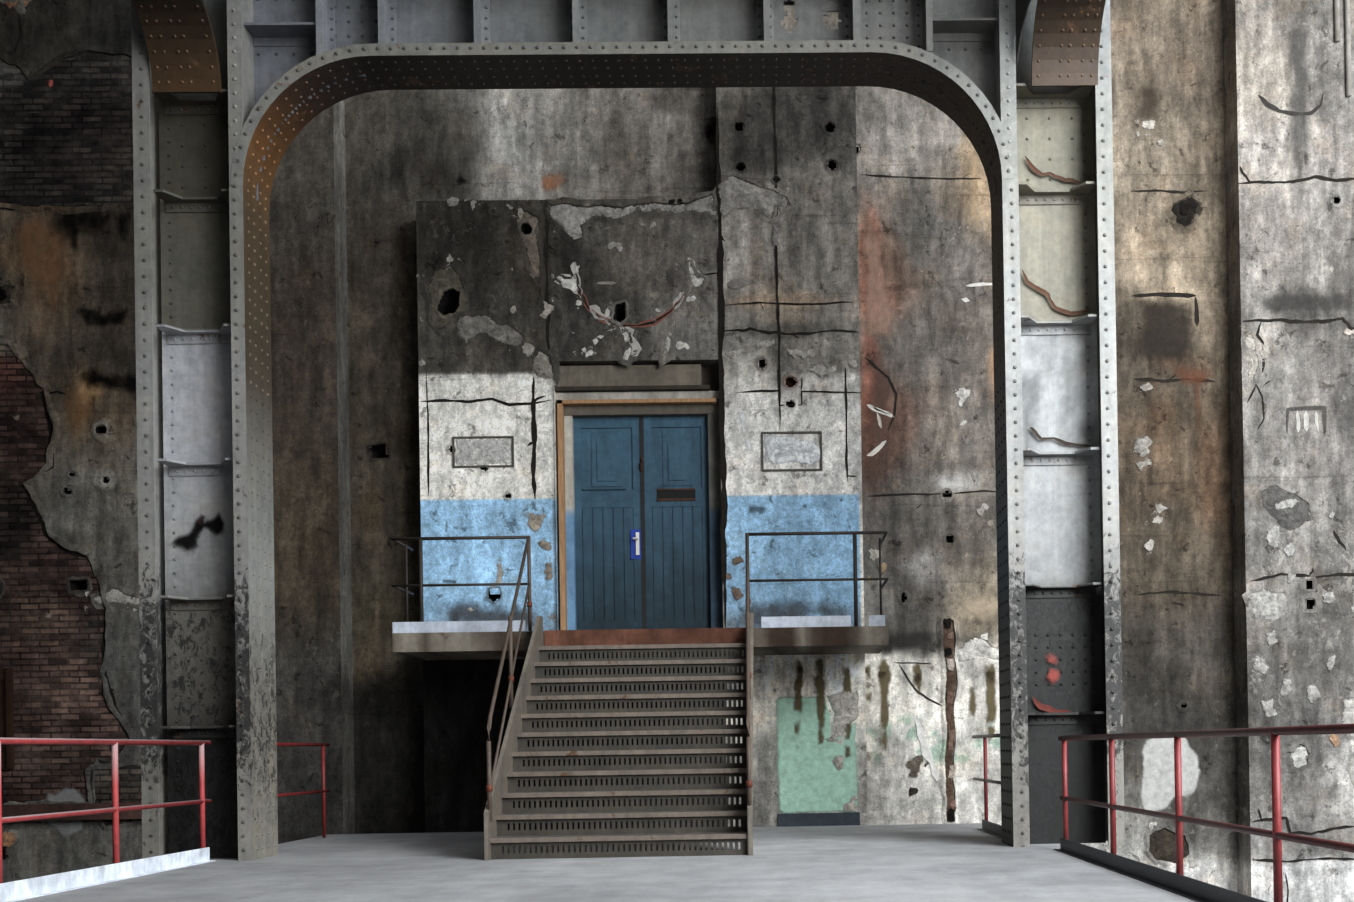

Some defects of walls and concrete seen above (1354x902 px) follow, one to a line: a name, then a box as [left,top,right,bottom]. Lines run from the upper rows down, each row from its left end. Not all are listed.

flaking render [0,45,134,215]
flaking render [441,169,797,319]
flaking render [417,254,711,386]
flaking render [0,338,142,805]
peeling [1242,573,1296,674]
peeling [1250,479,1335,557]
peeling [1321,592,1335,604]
flaking render [1261,678,1354,799]
flaking render [95,819,142,832]